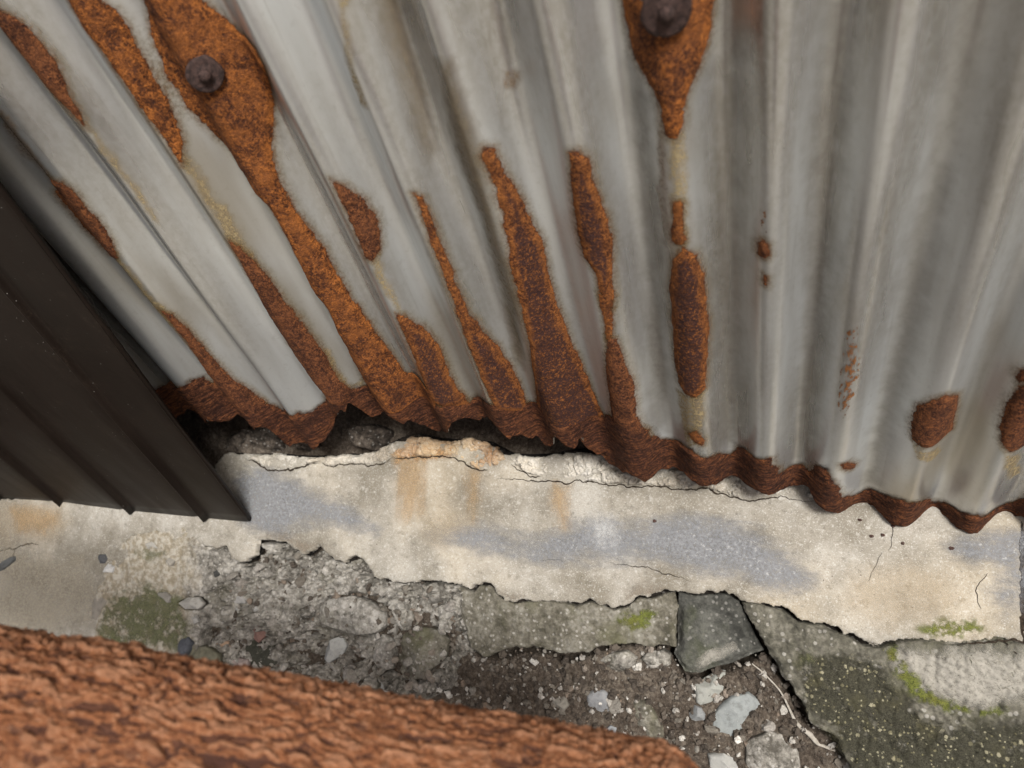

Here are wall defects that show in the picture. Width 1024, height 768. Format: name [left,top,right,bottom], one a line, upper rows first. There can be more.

corrosion [0,9,85,127]
corrosion [50,0,1024,534]
crack [245,455,810,502]
spalling [89,527,679,700]